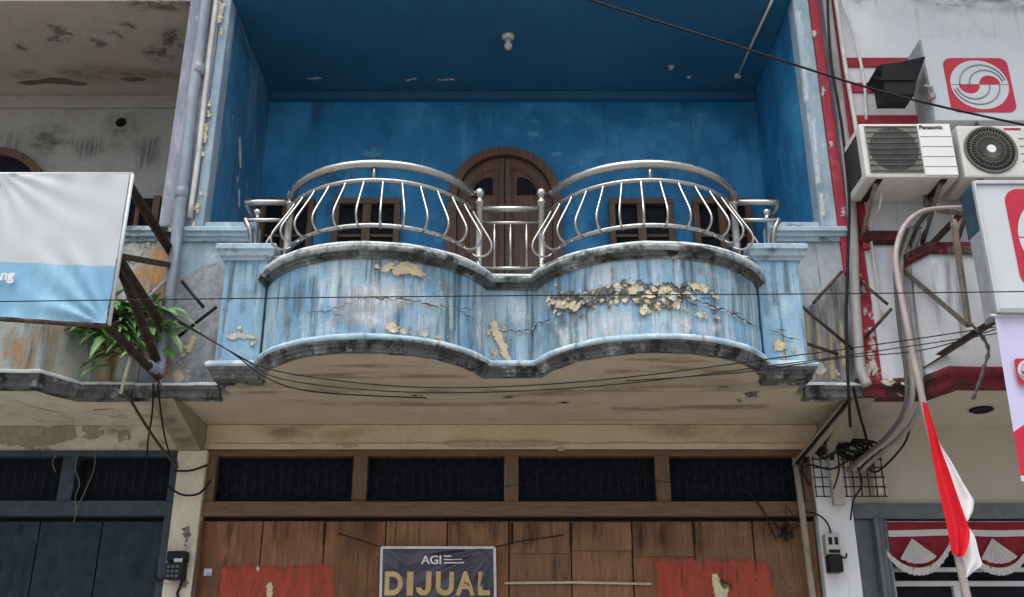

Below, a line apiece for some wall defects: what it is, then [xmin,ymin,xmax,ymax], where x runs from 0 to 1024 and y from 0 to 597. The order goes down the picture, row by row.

peeling [372,261,426,277]
peeling [167,261,258,383]
spalling [384,320,442,339]
crack [305,297,558,337]
peeling [487,318,512,360]
spalling [546,279,721,321]
crack [676,297,800,342]
peeling [772,275,905,387]